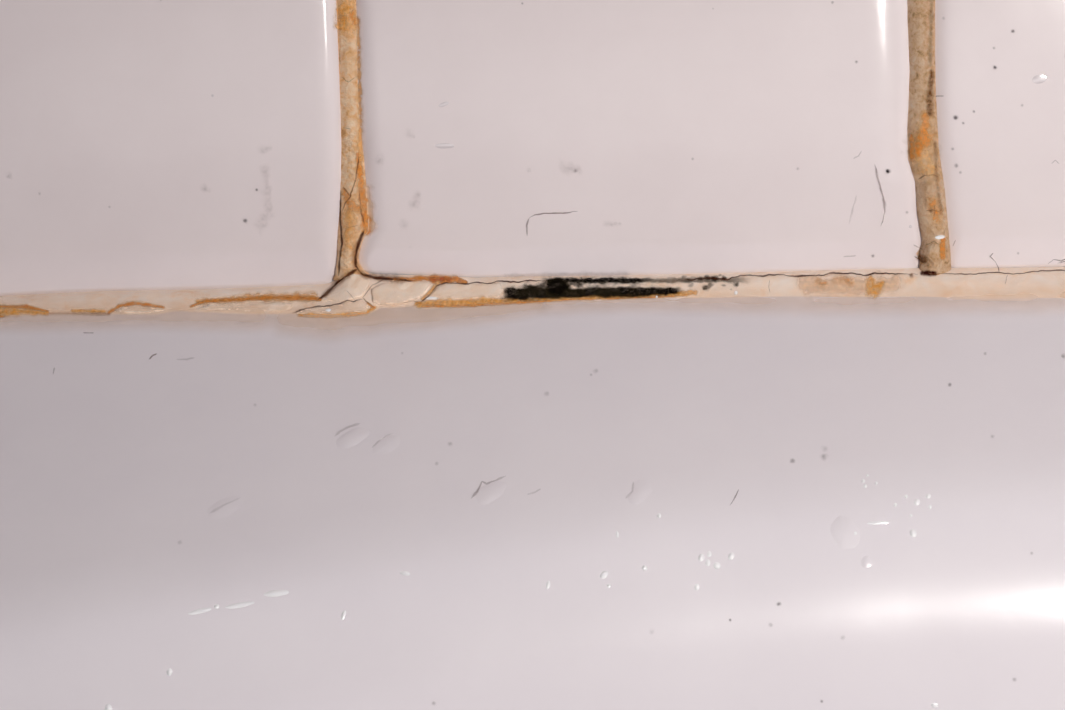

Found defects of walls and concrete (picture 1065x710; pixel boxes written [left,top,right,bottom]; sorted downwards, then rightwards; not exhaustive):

corrosion [336,0,374,249]
corrosion [909,113,935,174]
crack [294,159,540,313]
crack [686,257,1065,280]
damp [504,276,738,301]
corrosion [0,305,49,317]
corrosion [68,302,164,314]
corrosion [192,293,376,317]